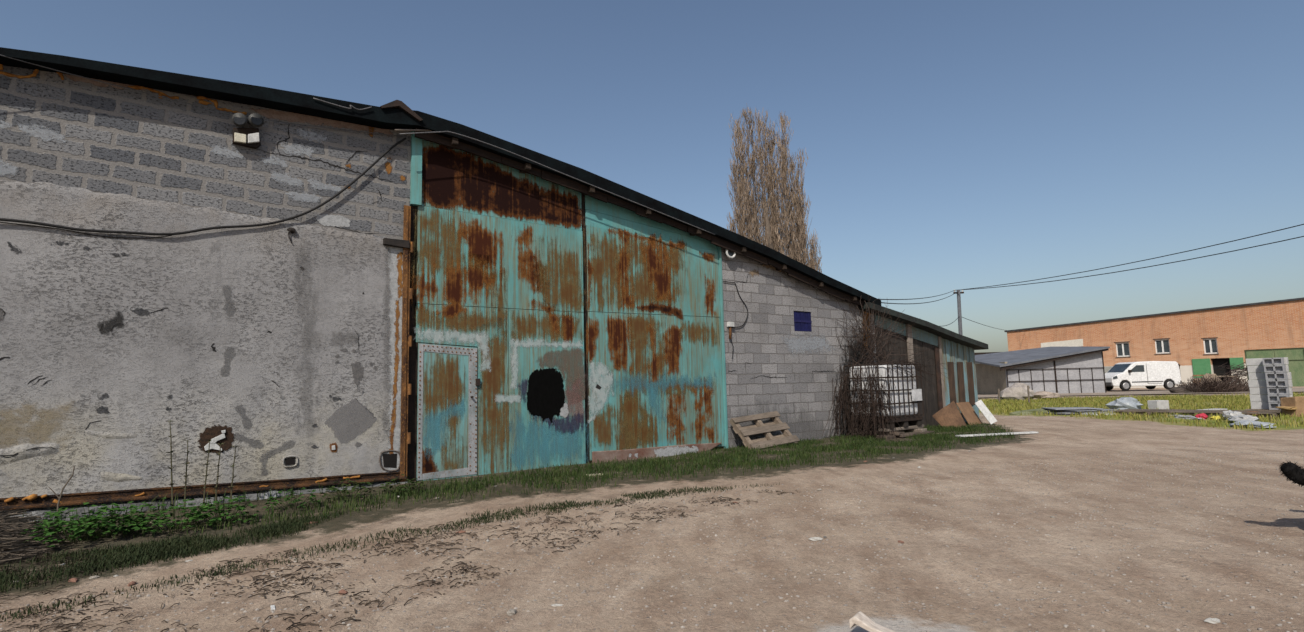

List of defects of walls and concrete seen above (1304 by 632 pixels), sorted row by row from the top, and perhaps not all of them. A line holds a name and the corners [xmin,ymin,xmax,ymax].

peeling [335,247,403,472]
rust [389,144,717,477]
rust [4,494,62,503]